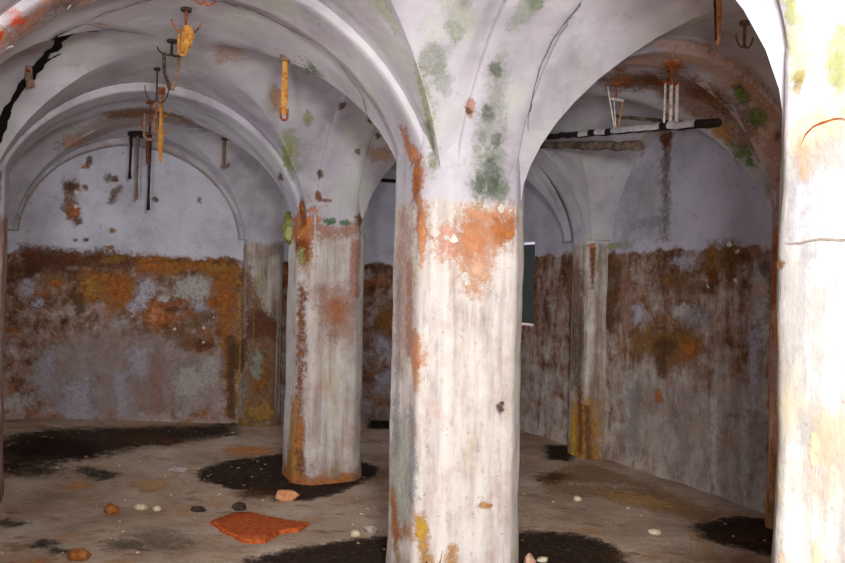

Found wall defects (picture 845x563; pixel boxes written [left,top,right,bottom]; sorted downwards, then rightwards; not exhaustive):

peeling [0,0,92,52]
crack [0,0,157,143]
crack [212,0,311,40]
leakage [419,66,436,168]
leakage [784,0,810,89]
crack [801,118,845,144]
leakage [823,26,845,94]
corrosion [398,125,433,268]
corrosion [317,240,360,338]
leakage [3,349,238,480]
corrosion [222,284,358,485]
corrosion [767,447,777,519]